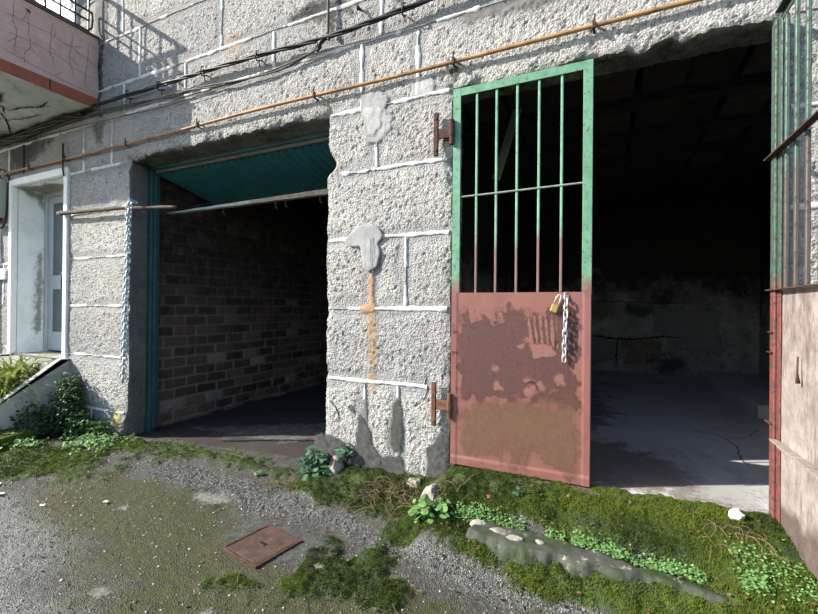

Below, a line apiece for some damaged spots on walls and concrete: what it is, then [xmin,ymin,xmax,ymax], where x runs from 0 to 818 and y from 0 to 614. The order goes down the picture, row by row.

crack [0,7,101,136]
corrosion [359,270,377,390]
crack [592,335,690,364]
damp [191,398,405,475]
damp [426,430,449,479]
crack [643,424,758,468]